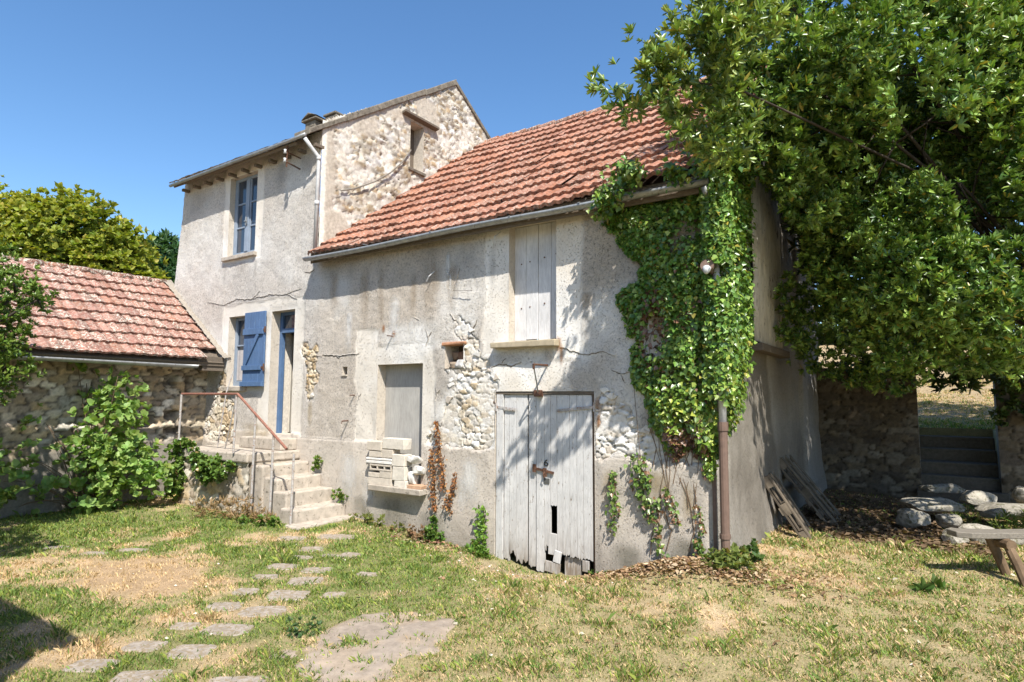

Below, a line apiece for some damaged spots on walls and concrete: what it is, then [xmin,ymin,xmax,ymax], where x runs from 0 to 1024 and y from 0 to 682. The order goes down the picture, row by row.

crack [207,269,315,306]
flaking render [205,371,235,444]
flaking render [302,343,322,399]
flaking render [428,316,500,450]
crack [561,347,629,383]
flaking render [596,387,666,463]